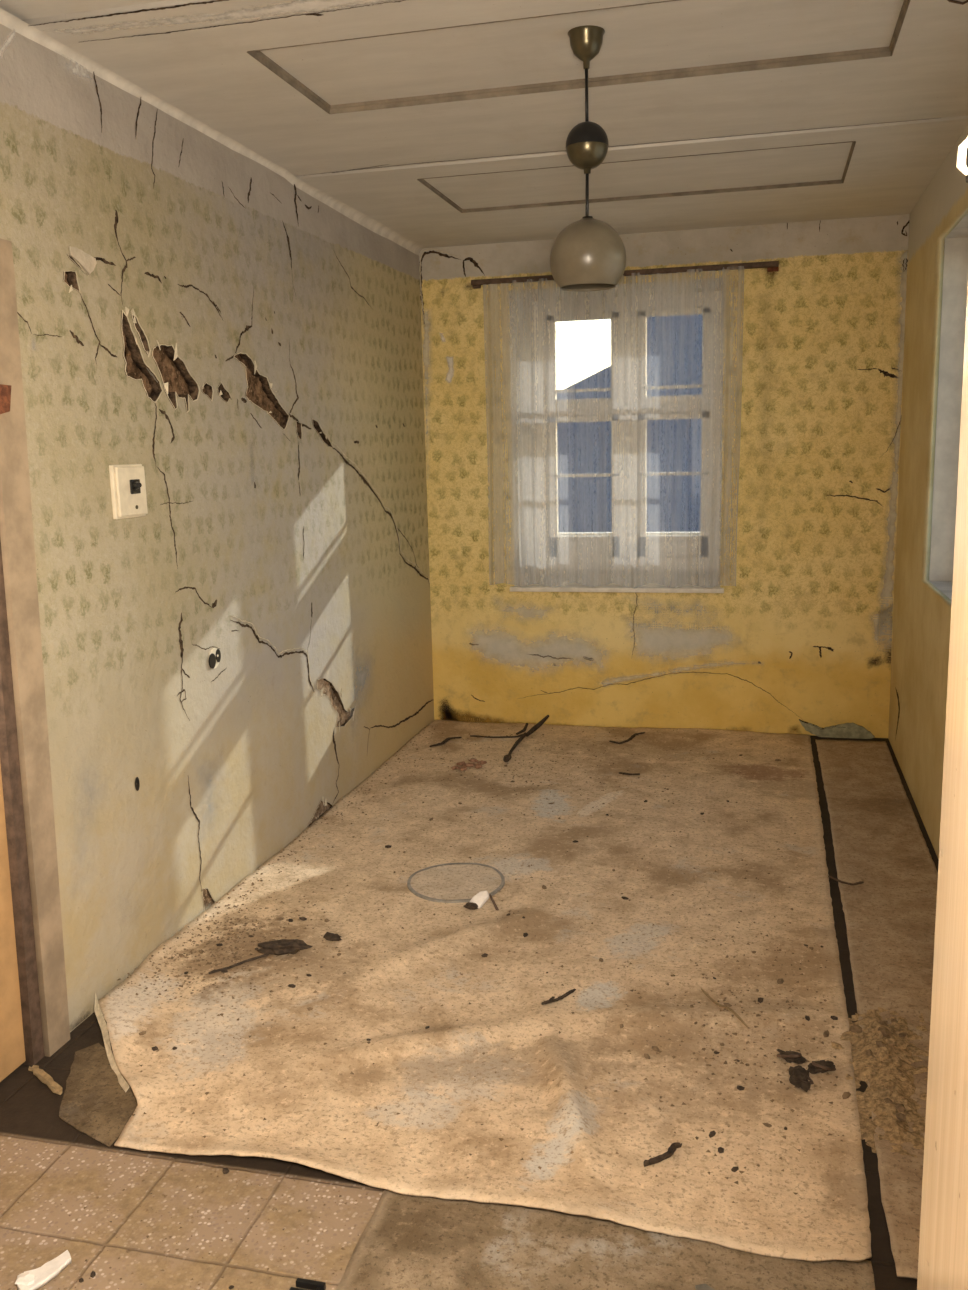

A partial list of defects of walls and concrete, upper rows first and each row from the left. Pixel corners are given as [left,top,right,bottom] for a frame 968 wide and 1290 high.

crack [29,0,405,42]
crack [136,98,184,187]
flaking render [63,246,97,293]
flaking render [121,307,290,430]
crack [17,150,566,585]
crack [152,404,315,719]
flaking render [317,678,356,732]
crack [333,699,434,803]
peeling [473,632,600,667]
crack [519,594,834,718]
peeling [636,606,731,655]
crack [188,777,202,891]